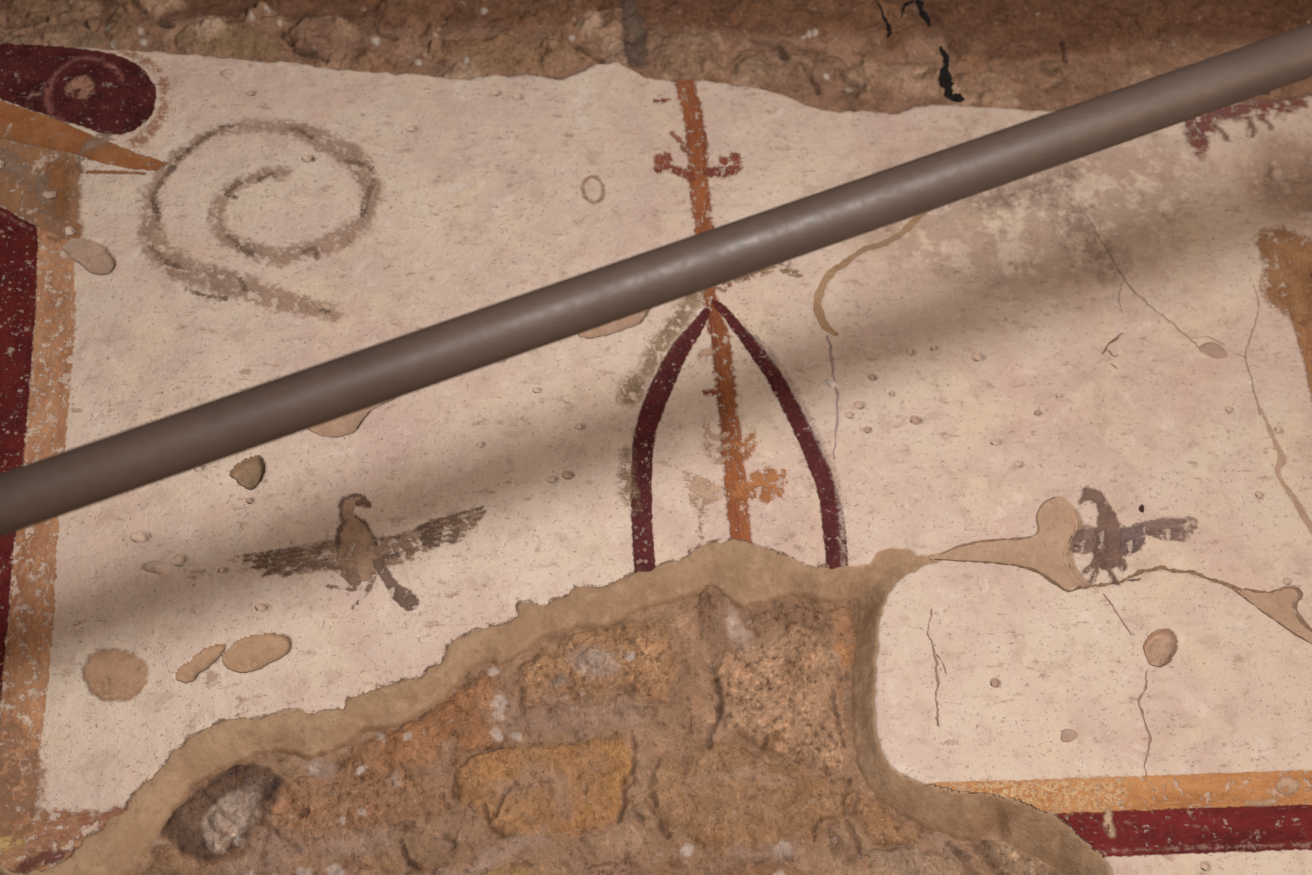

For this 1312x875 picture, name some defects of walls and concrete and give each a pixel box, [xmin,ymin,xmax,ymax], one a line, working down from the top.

flaking render [309,399,393,437]
flaking render [578,310,648,339]
crack [813,211,930,459]
crack [1079,205,1312,535]
spalling [230,455,265,503]
crack [927,608,947,727]
spalling [1143,628,1178,667]
crack [1083,565,1312,643]
spalling [131,584,1060,875]
crack [1138,669,1152,782]